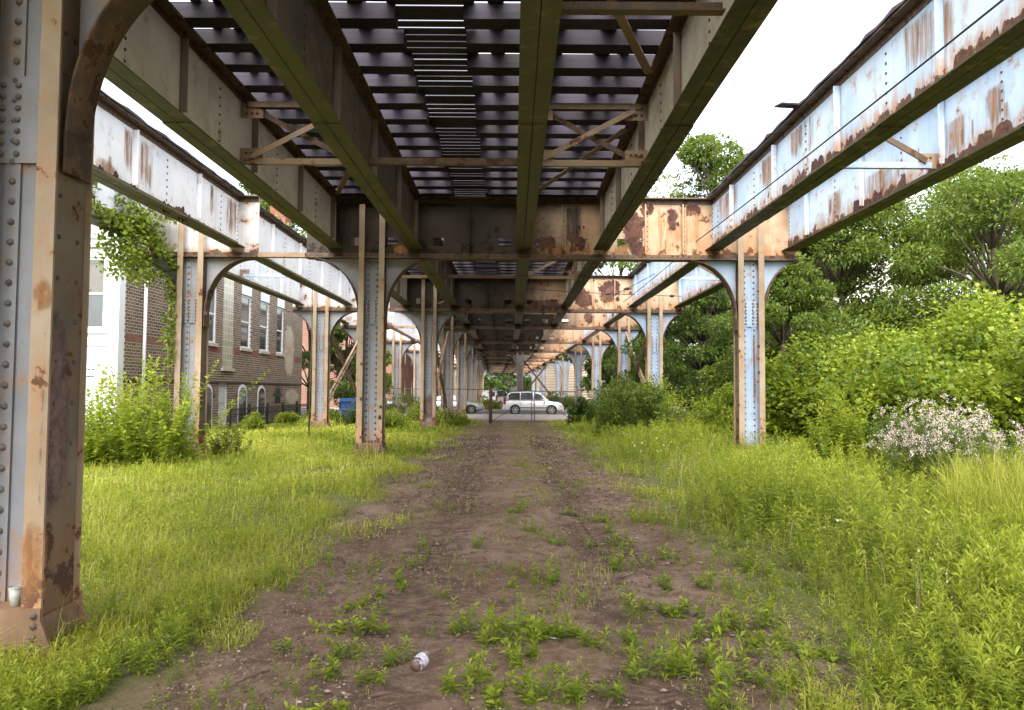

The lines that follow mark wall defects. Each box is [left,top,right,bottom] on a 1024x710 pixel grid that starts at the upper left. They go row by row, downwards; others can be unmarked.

corrosion [93,130,151,189]
corrosion [829,192,839,217]
corrosion [782,84,930,193]
corrosion [853,169,906,213]
corrosion [927,88,1013,174]
corrosion [21,530,39,596]